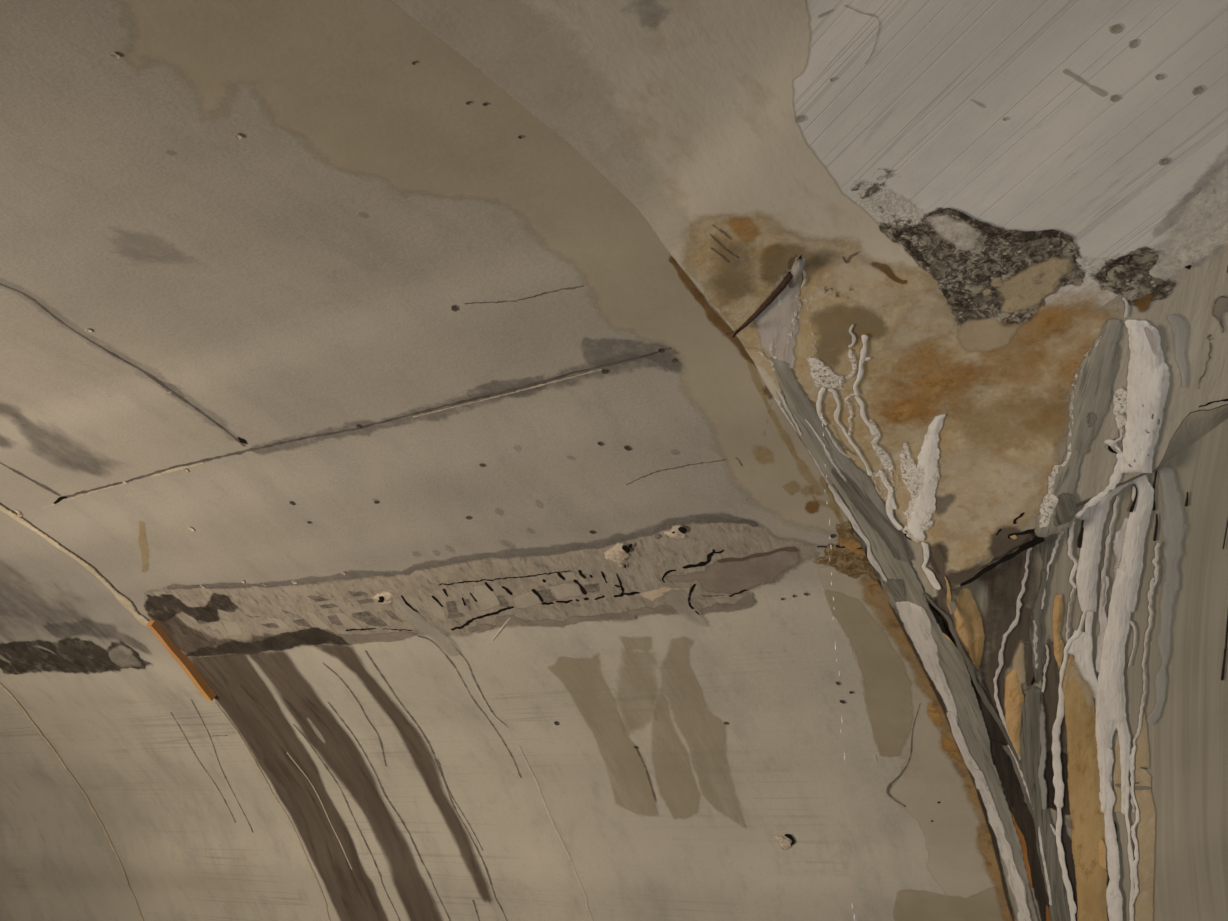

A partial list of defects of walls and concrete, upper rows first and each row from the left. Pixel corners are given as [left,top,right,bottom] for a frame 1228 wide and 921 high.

peeling [927,215,980,250]
damp [1149,165,1228,281]
crack [63,348,671,498]
corrosion [669,215,1109,585]
crack [1198,335,1228,407]
damp [0,638,150,674]
damp [144,593,593,921]
spalling [145,514,826,657]
corrosion [839,540,1015,921]
damp [745,233,1188,921]